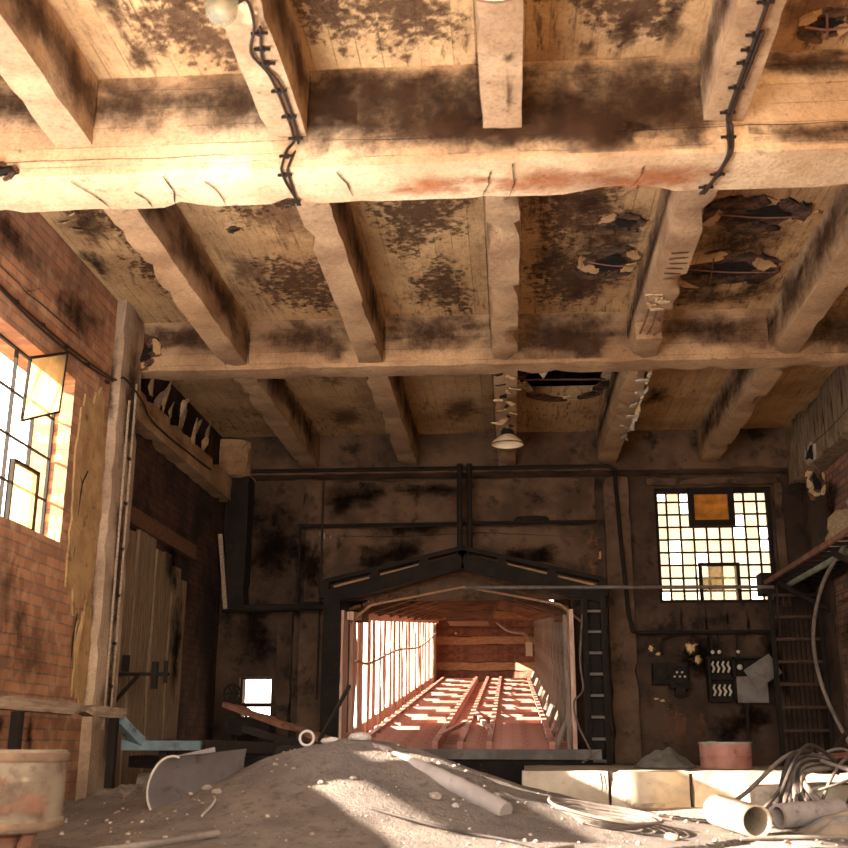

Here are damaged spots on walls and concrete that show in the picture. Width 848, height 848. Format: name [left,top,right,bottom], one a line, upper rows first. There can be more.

leakage [97,0,238,72]
leakage [240,2,256,24]
leakage [292,0,468,63]
leakage [558,0,694,51]
spalling [797,8,848,44]
spalling [597,212,650,235]
spalling [702,194,820,234]
leakage [357,197,476,314]
spalling [575,245,641,280]
spalling [663,249,783,288]
spalling [639,293,670,336]